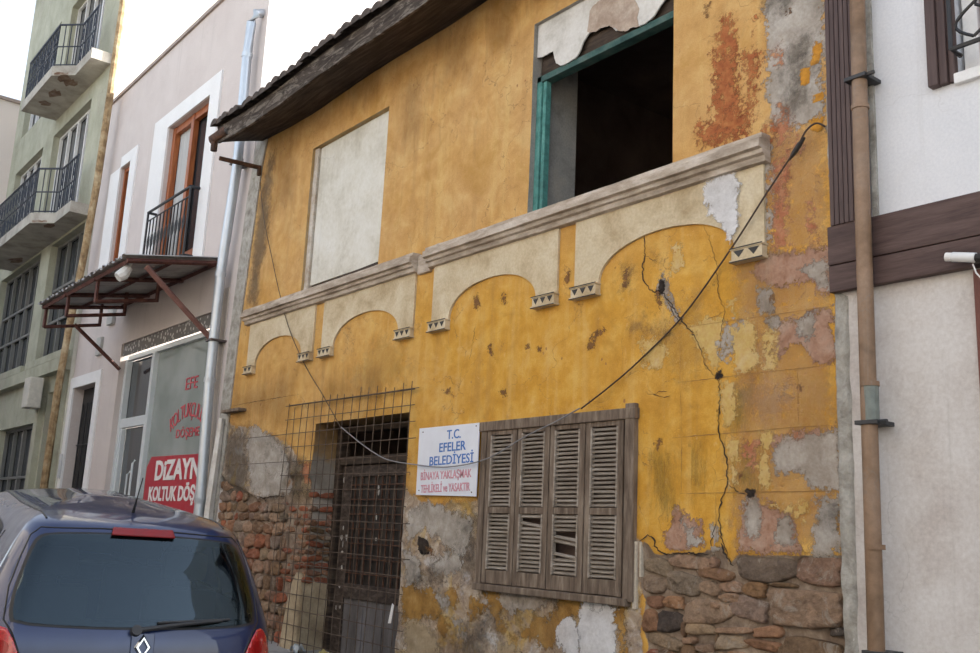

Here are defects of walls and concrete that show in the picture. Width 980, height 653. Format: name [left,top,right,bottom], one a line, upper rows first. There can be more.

peeling [587,0,639,33]
flaking render [655,0,836,428]
peeling [636,335,669,371]
crack [640,236,756,566]
flaking render [263,442,348,584]
peeling [662,504,721,554]
flaking render [725,421,841,558]
peeling [400,536,582,653]
peeling [612,606,630,653]